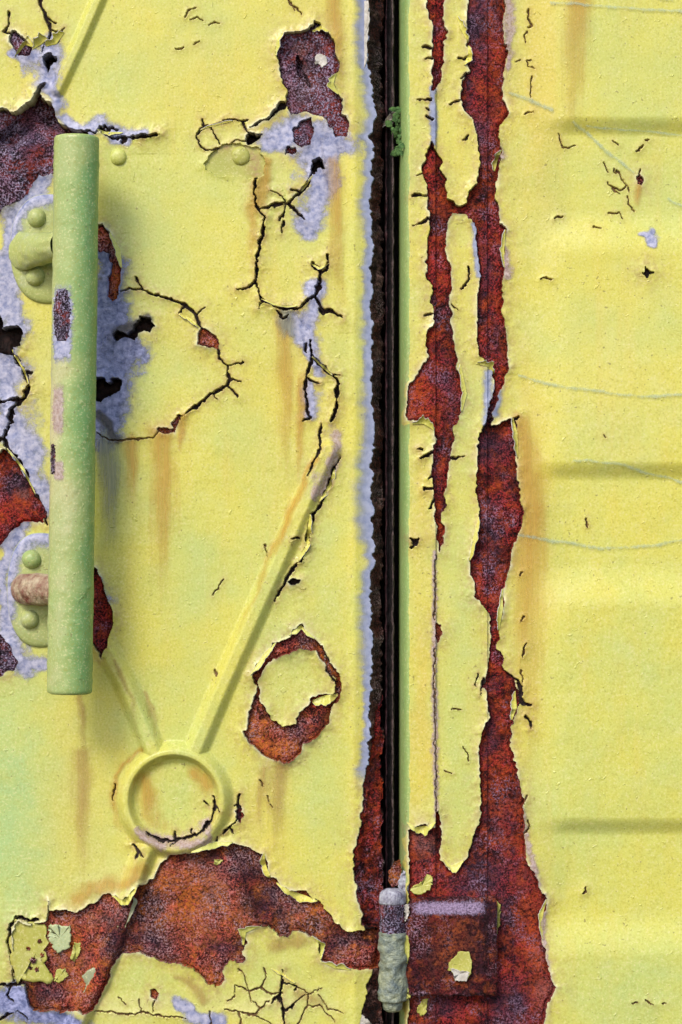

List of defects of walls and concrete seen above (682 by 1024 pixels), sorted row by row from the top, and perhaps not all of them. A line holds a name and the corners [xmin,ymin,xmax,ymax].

peeling [0,173,64,515]
rust [0,78,82,216]
peeling [52,288,74,360]
peeling [95,251,160,452]
crack [121,276,244,417]
crack [240,171,343,320]
crack [274,340,341,602]
rust [272,15,354,155]
peeling [242,0,396,777]
rust [401,0,561,1024]
rust [6,695,384,1020]
crack [94,968,344,1024]